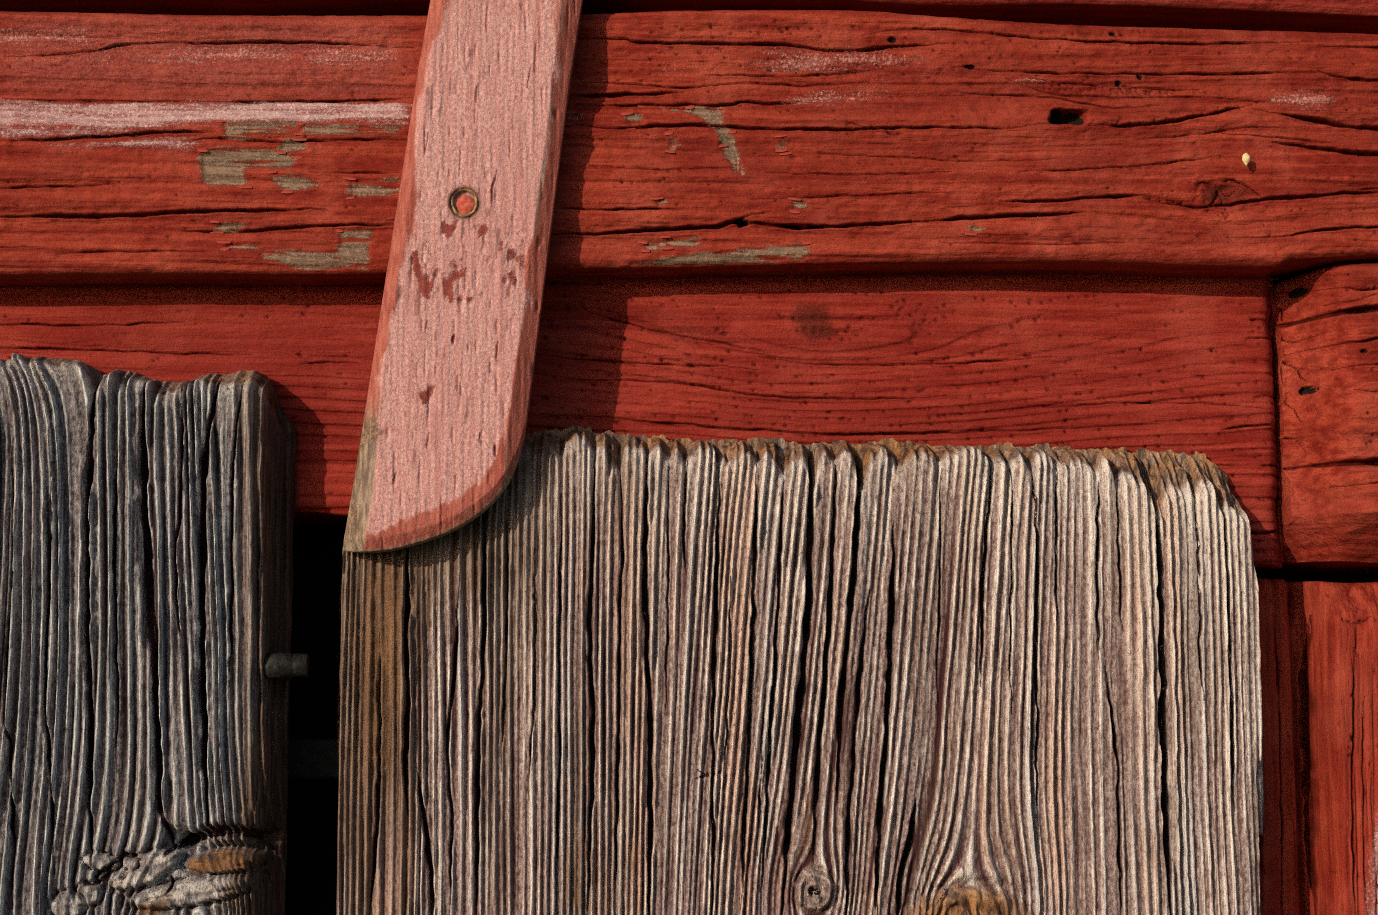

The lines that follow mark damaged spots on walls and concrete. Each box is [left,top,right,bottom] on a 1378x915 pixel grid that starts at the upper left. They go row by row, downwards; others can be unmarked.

crack [5,586,13,692]
crack [4,727,16,915]
crack [9,447,17,510]
crack [11,323,281,896]
crack [369,316,1281,915]
crack [1259,617,1317,915]
crack [1347,618,1378,901]